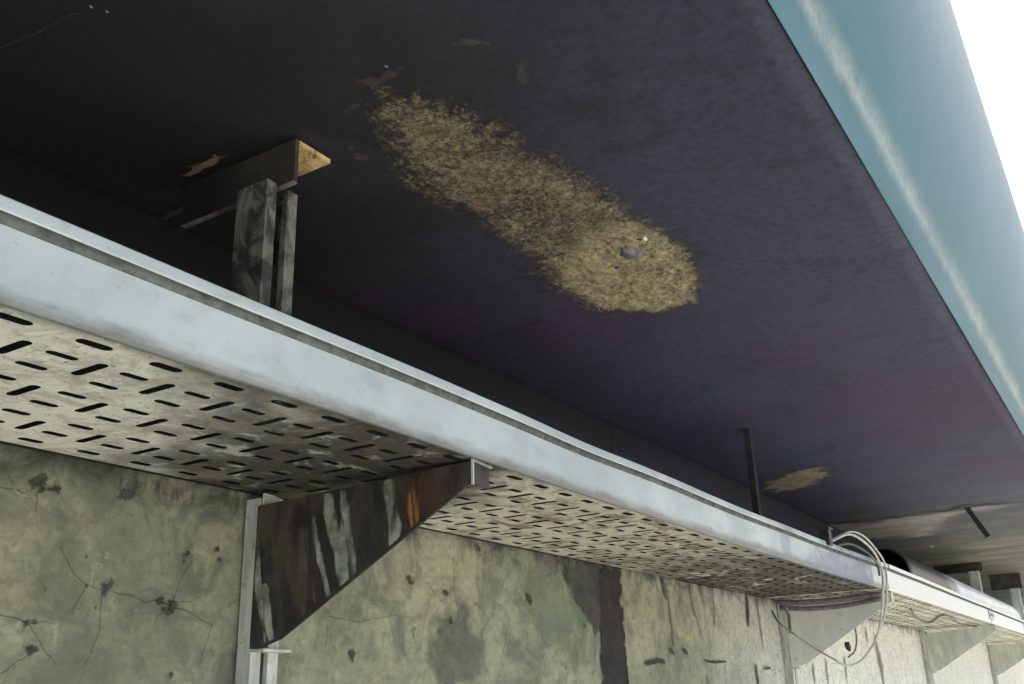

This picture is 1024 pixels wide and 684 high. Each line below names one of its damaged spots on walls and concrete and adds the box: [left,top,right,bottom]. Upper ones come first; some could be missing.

spalling [372,90,705,313]
spalling [763,467,827,493]
leakage [563,560,629,684]